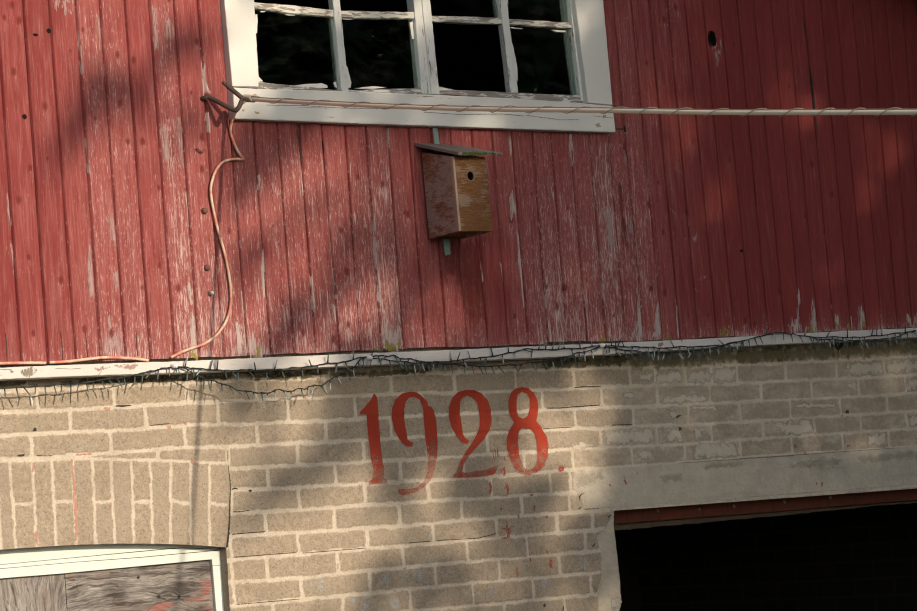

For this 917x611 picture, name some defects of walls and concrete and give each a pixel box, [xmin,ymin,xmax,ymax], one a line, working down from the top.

peeling [152,6,174,49]
peeling [200,48,210,96]
peeling [159,116,184,169]
peeling [87,245,95,297]
peeling [372,216,403,352]
peeling [509,190,525,308]
peeling [628,218,661,342]
peeling [104,314,124,356]
peeling [187,281,198,356]
peeling [788,288,818,334]
peeling [831,306,866,330]